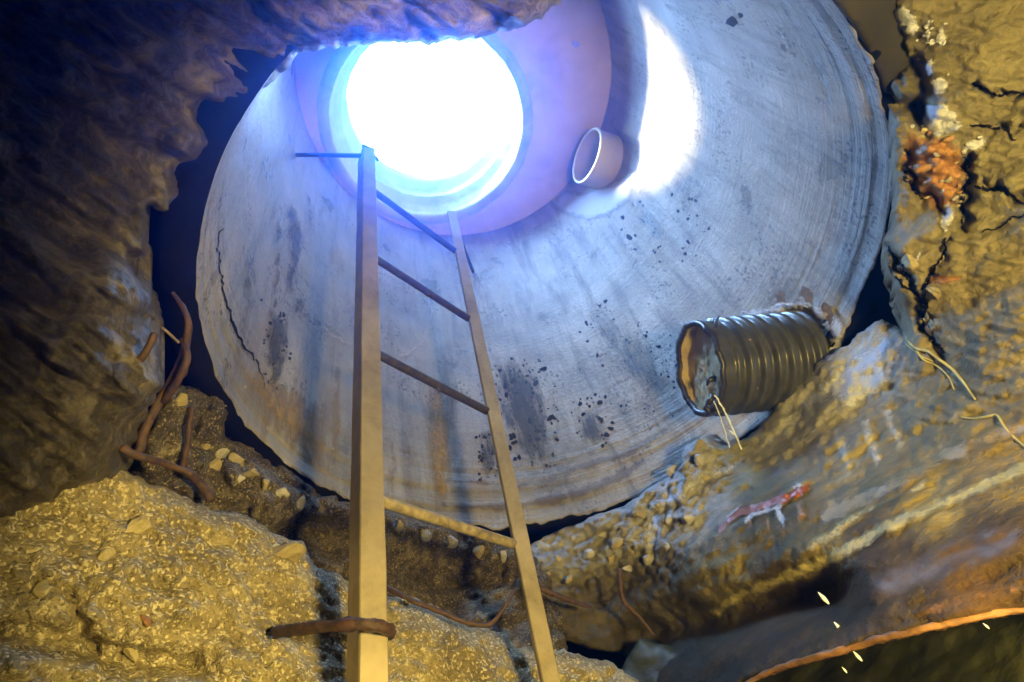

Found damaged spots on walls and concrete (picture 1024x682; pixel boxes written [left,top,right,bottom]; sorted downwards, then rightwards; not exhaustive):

crack [216,228,265,387]